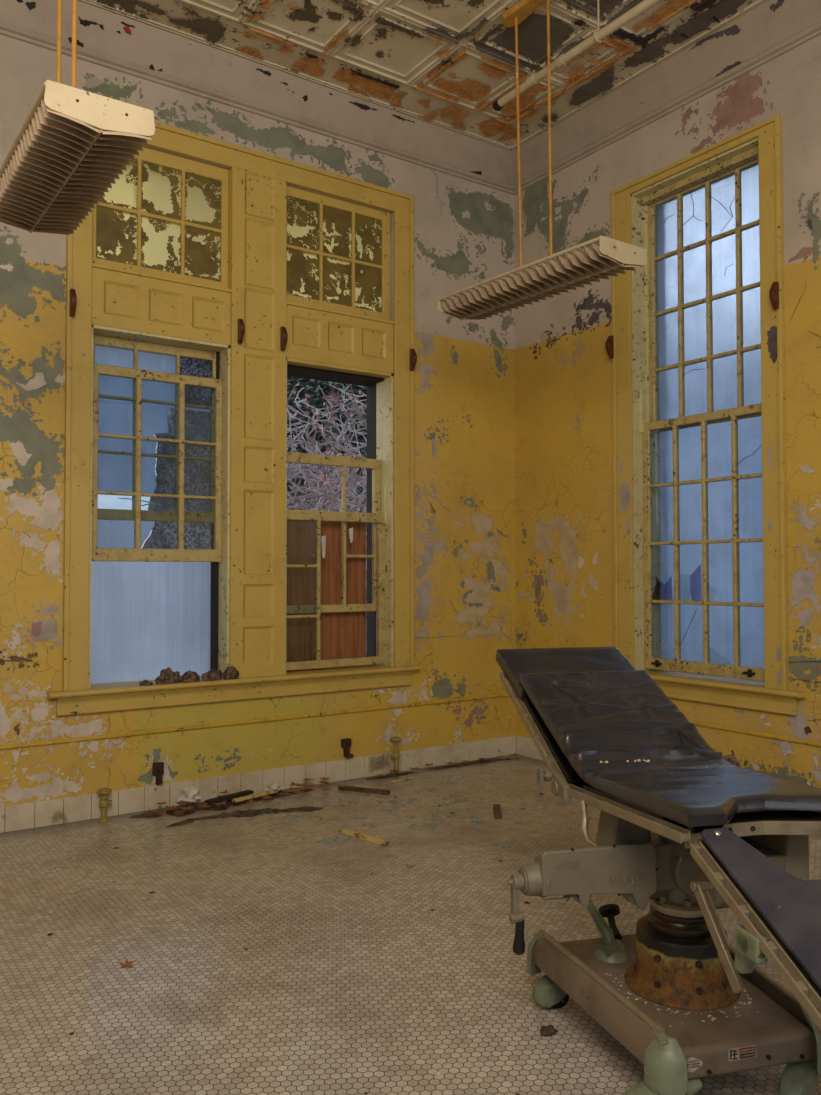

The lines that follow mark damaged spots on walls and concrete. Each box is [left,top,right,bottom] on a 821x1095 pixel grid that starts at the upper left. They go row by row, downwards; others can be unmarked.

peeling [83,72,143,103]
peeling [78,0,231,47]
peeling [154,100,395,188]
rust [235,0,638,141]
peeling [285,0,752,108]
rust [633,0,698,31]
peeling [675,61,773,154]
peeling [0,226,66,327]
peeling [414,165,610,283]
peeling [0,341,65,584]
peeling [414,482,598,651]
peeling [719,495,821,789]